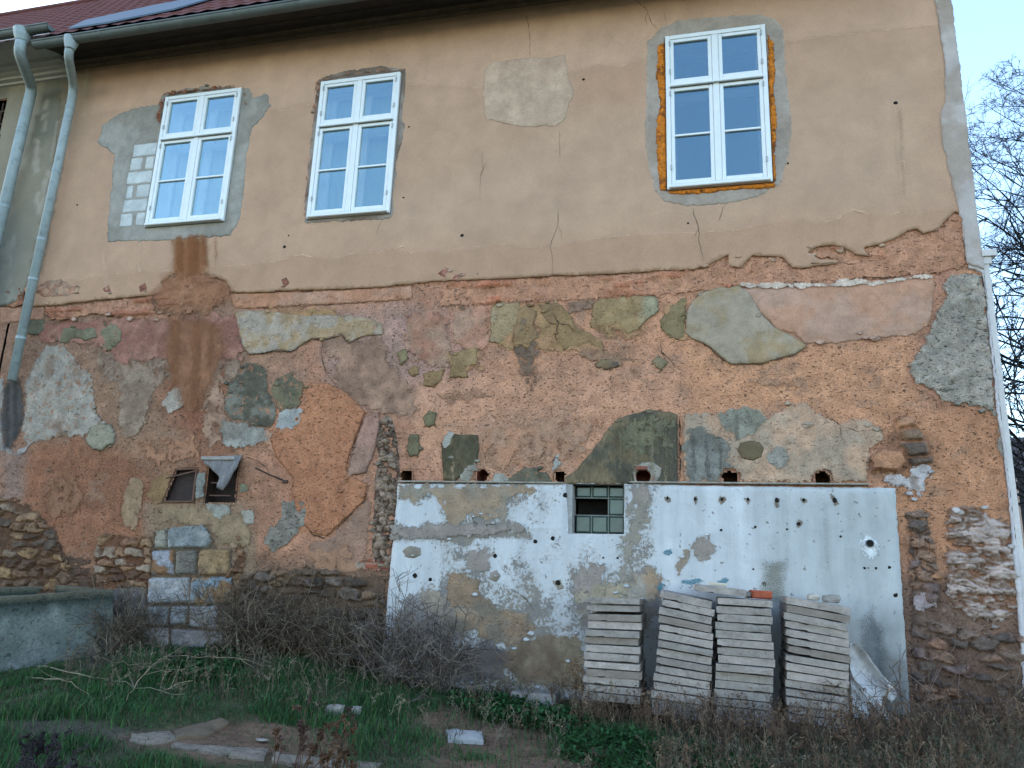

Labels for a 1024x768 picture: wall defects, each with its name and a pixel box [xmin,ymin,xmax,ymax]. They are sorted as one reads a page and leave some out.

flaking render [5,213,968,576]
flaking render [113,473,251,648]
peeling [389,414,603,690]
peeling [570,483,663,605]